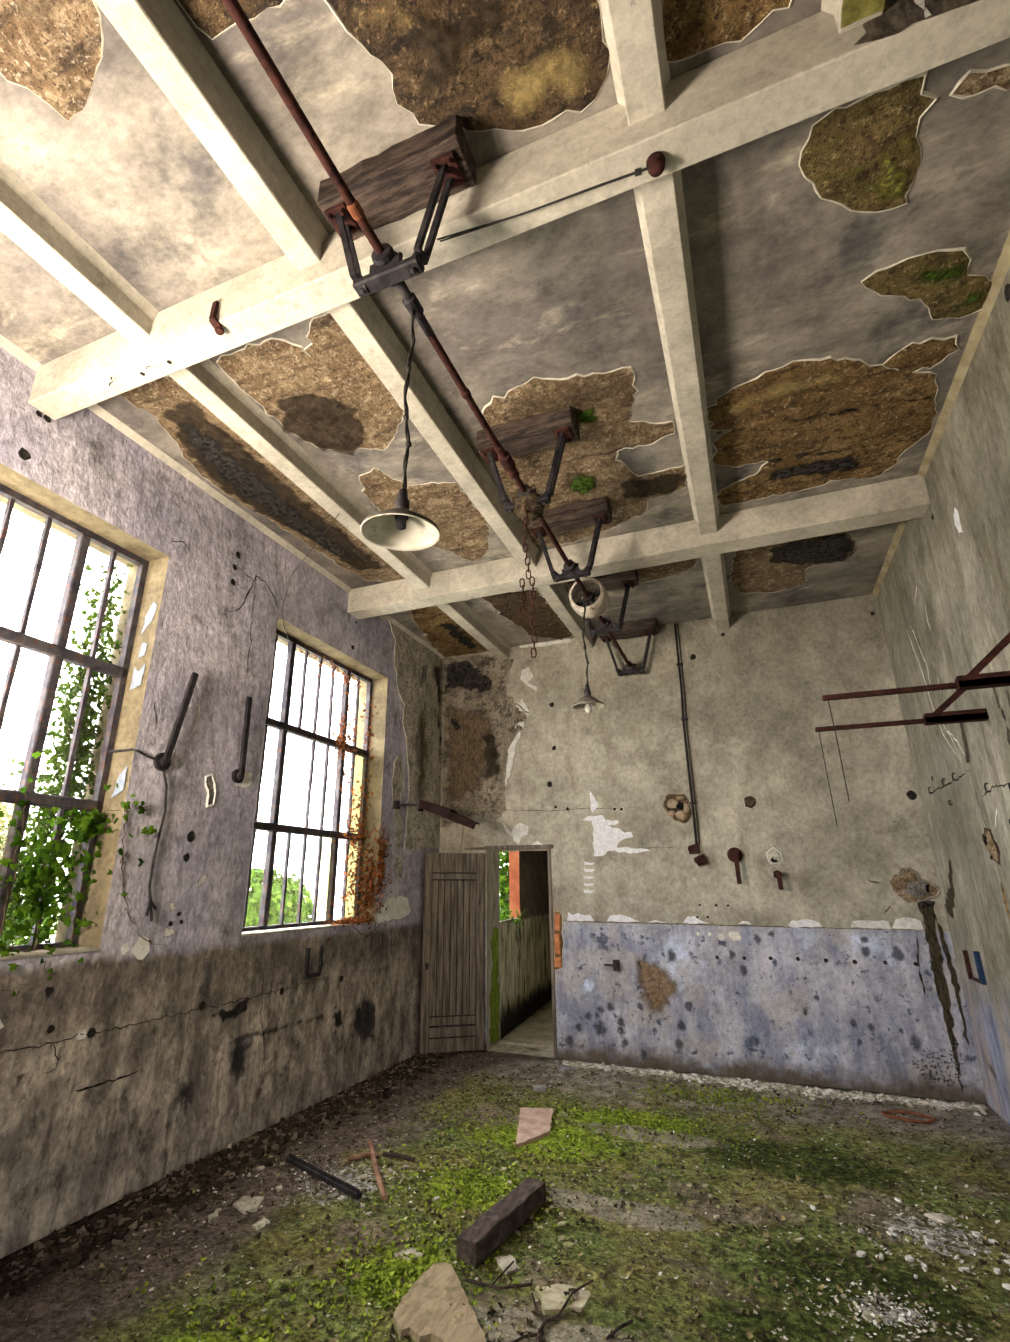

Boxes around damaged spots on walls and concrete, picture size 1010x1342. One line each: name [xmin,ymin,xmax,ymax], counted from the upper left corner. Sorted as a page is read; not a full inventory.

flaking render [0,0,104,122]
flaking render [324,0,610,132]
flaking render [661,0,793,63]
flaking render [798,64,1010,213]
flaking render [216,311,404,455]
flaking render [707,247,992,506]
flaking render [121,376,405,582]
flaking render [359,468,490,562]
flaking render [481,366,687,547]
flaking render [729,531,856,594]
damp [892,939,925,994]
damp [899,913,969,1087]